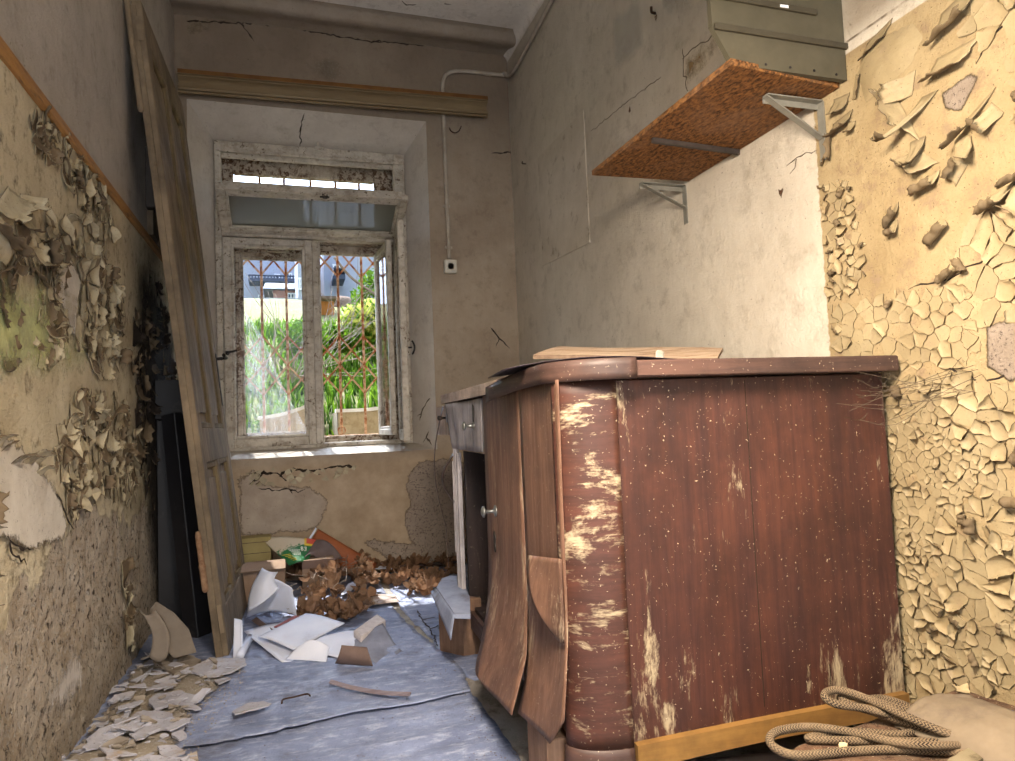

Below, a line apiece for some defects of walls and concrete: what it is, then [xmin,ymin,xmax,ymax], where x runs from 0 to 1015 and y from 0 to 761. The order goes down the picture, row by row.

crack [187,20,268,41]
crack [303,30,446,49]
crack [591,35,712,131]
peeling [818,0,1015,197]
peeling [0,105,177,549]
peeling [817,172,1015,698]
flaking render [237,465,356,535]
flaking render [366,459,467,569]